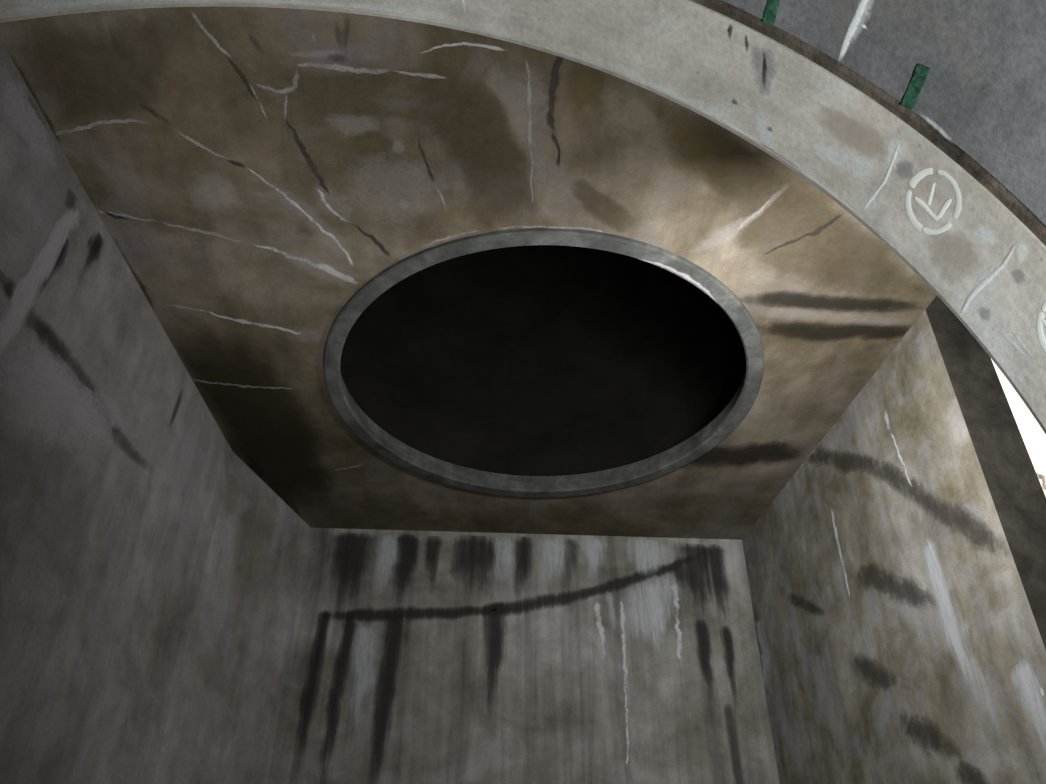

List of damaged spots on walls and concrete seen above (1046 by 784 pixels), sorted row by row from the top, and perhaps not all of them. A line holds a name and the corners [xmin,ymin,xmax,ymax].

crack [839,0,869,58]
crack [182,27,389,283]
crack [528,57,563,189]
crack [863,140,902,210]
crack [177,306,299,335]
crack [962,245,1026,311]
leakage [692,444,993,551]
leakage [334,534,441,596]
leakage [456,536,531,582]
leakage [321,618,403,776]
leakage [484,604,504,696]
leakage [594,543,727,763]